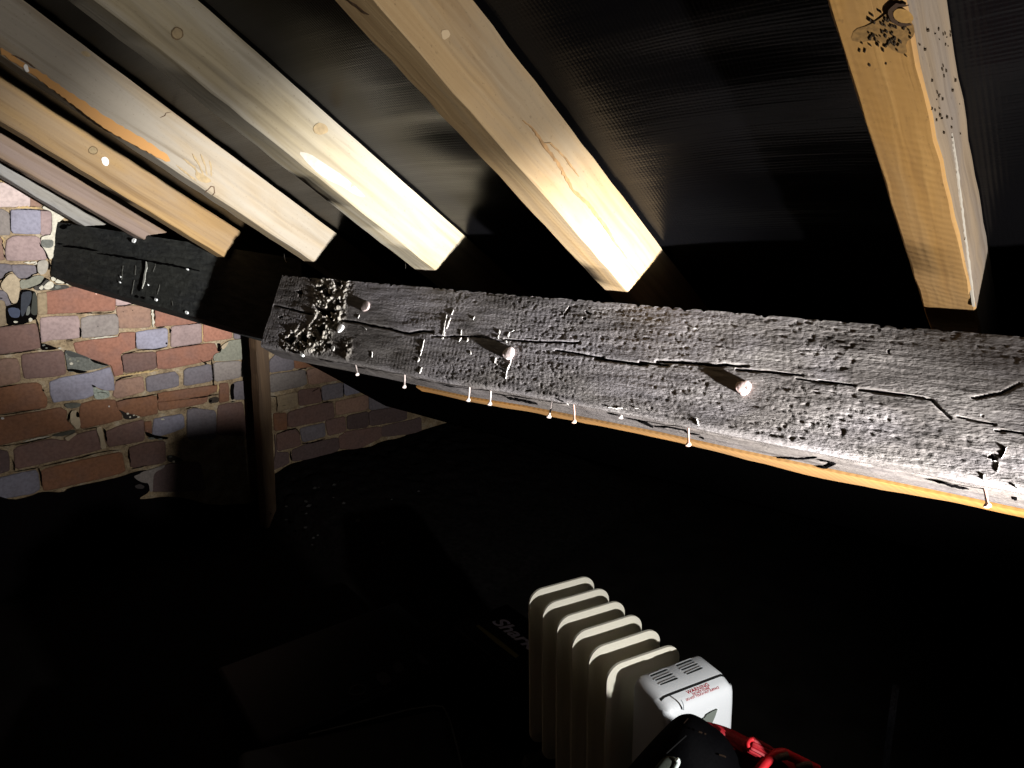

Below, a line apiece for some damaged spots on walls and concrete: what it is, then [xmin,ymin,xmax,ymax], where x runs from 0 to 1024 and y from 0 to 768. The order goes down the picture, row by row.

mould [851,7,951,65]
water stain [931,64,961,138]
crack [343,321,1023,435]
crack [777,457,836,471]
crack [937,482,969,490]